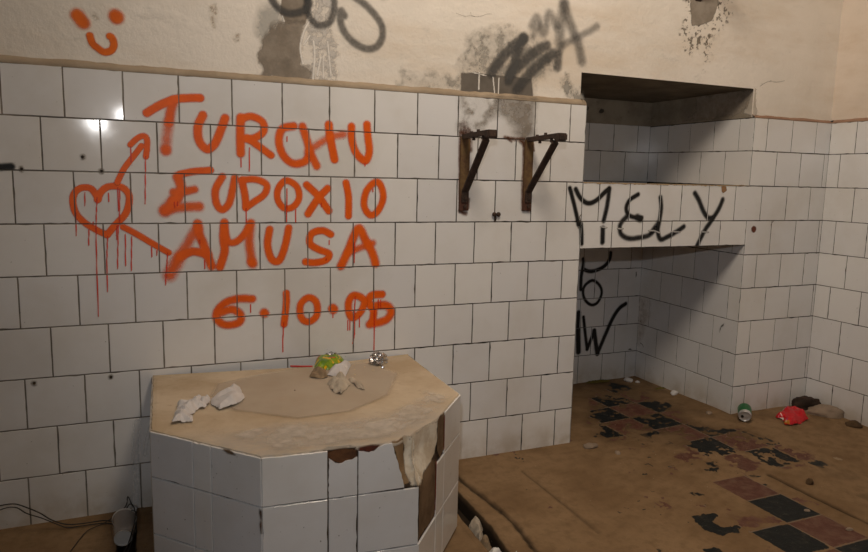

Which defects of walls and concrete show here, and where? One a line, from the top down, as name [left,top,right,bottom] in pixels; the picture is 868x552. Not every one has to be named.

flaking render [258,0,312,79]
spalling [679,0,729,62]
rust [504,136,535,211]
spalling [327,413,445,540]